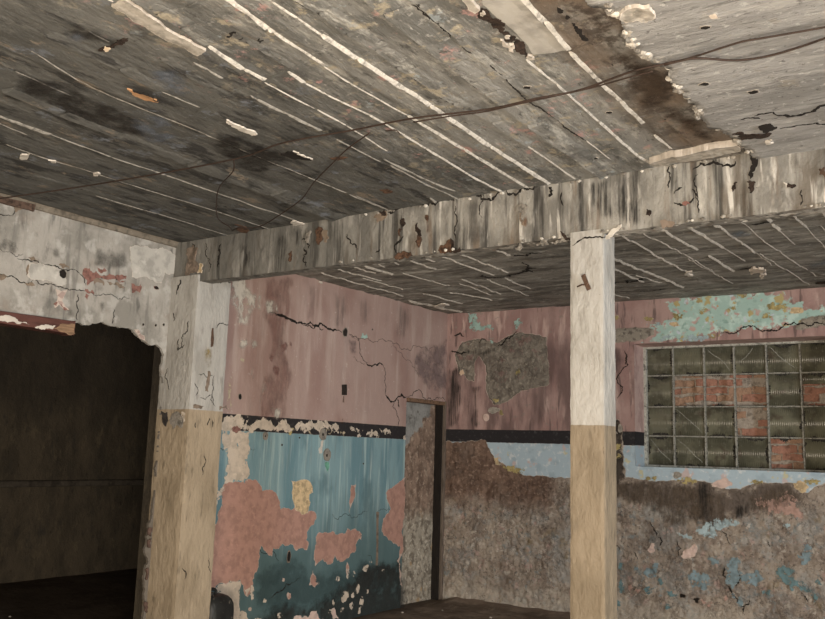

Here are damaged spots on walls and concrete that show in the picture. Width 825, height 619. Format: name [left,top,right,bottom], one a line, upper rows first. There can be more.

spalling [477,8,534,60]
spalling [557,7,588,41]
flaking render [604,3,705,120]
crack [741,104,825,129]
crack [0,249,128,323]
flaking render [82,245,176,299]
peeling [0,315,75,335]
crack [269,312,445,424]
crack [452,332,516,355]
peeling [211,406,391,619]
peeling [382,477,406,585]
peeling [677,518,739,559]